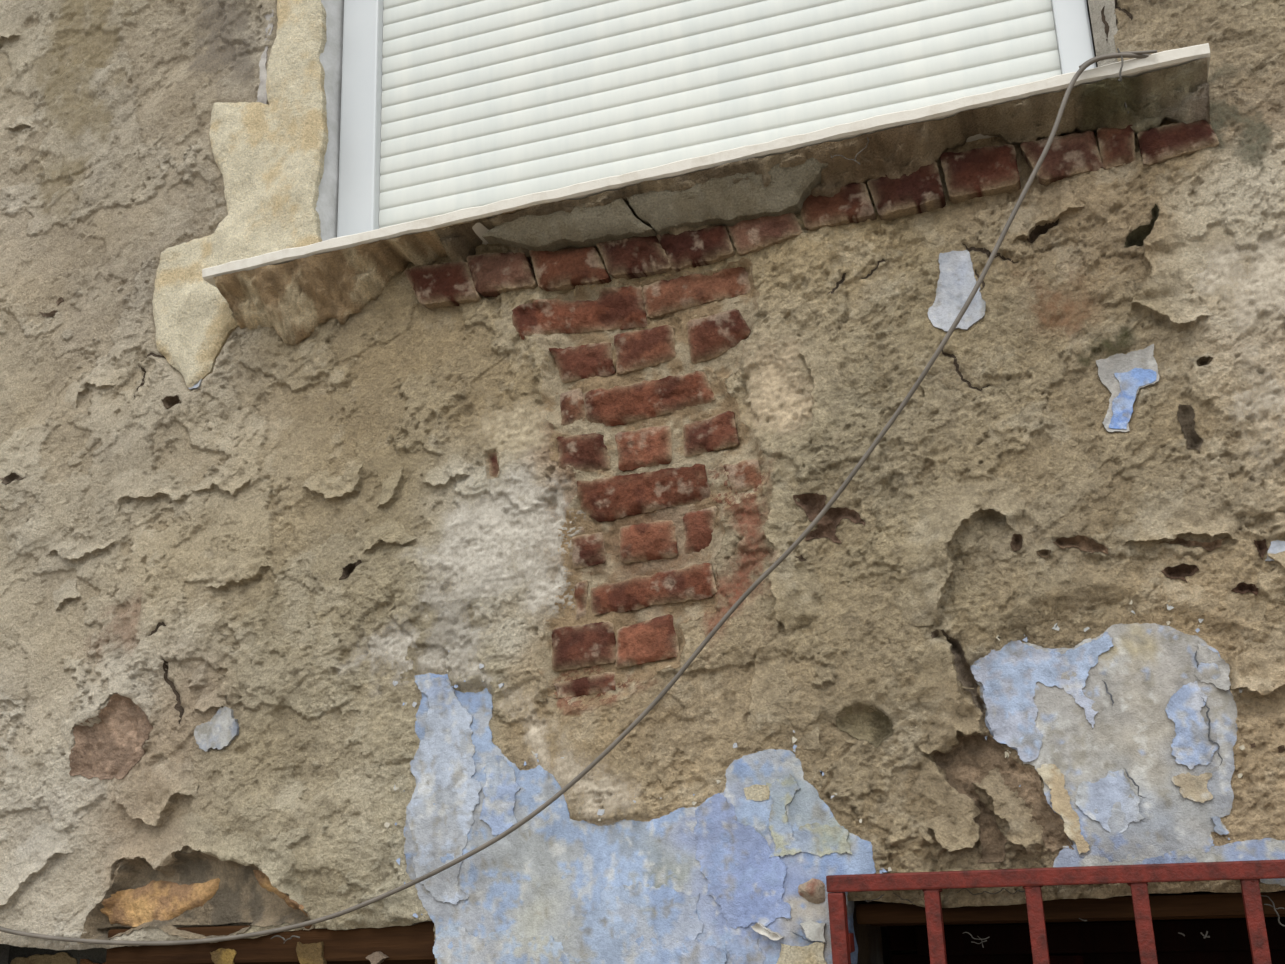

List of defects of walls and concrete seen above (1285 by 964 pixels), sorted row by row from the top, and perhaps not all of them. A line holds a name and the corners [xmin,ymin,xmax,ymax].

crack [962,243,1017,290]
crack [940,342,989,391]
flaking render [206,542,273,589]
peeling [384,120,1285,964]
crack [148,622,184,724]
flaking render [0,673,327,964]